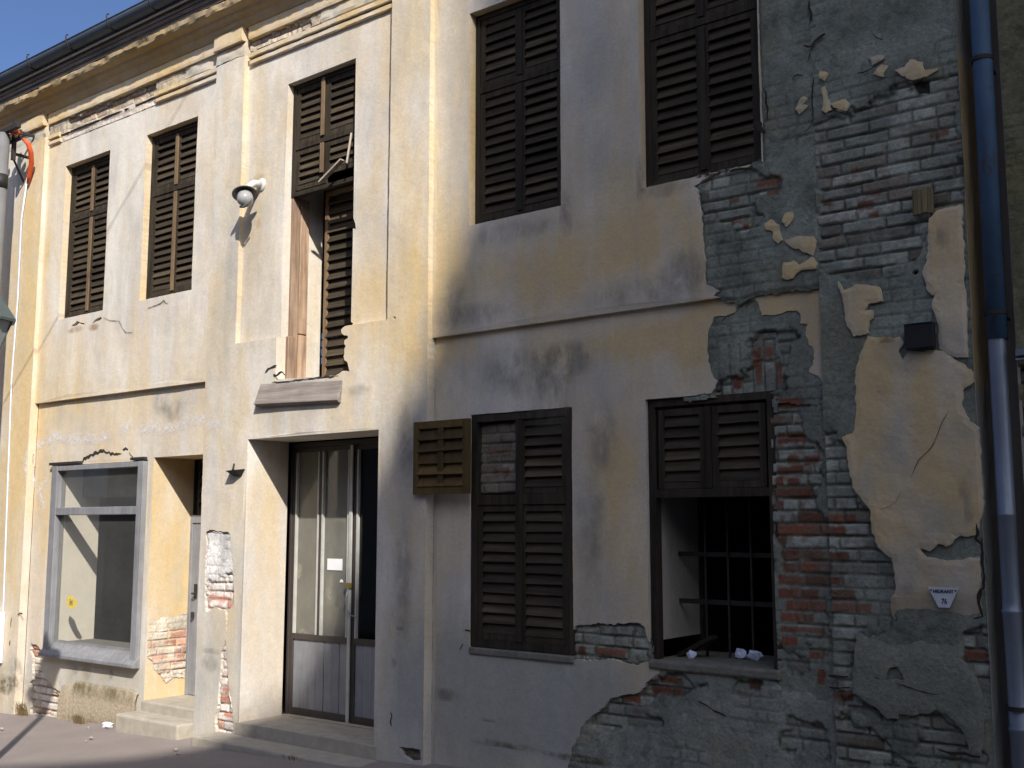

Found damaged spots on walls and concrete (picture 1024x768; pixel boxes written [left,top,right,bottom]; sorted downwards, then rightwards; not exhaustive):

flaking render [568,0,995,768]
crack [82,447,133,461]
crack [882,411,949,509]
flaking render [206,531,234,615]
flaking render [32,644,60,716]
flaking render [147,612,187,683]
flaking render [216,646,234,734]